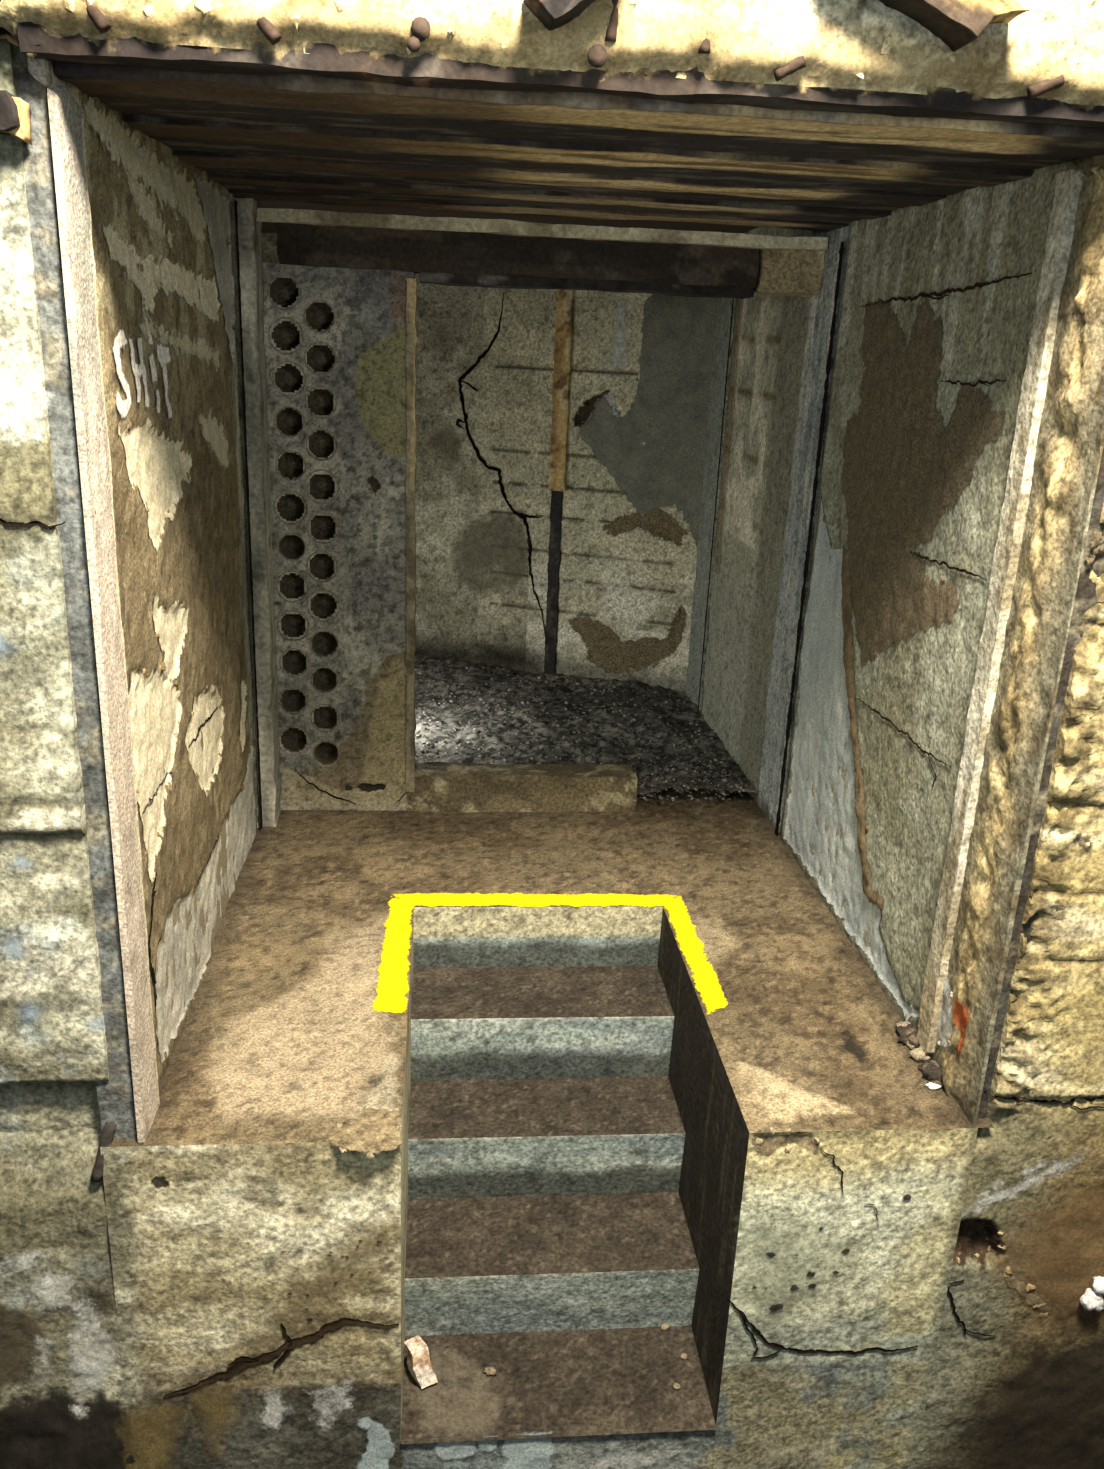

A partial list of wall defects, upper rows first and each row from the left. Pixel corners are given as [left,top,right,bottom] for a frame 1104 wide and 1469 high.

peeling [69,87,236,371]
peeling [118,418,192,551]
crack [456,294,545,634]
spalling [568,604,687,674]
peeling [128,592,260,1063]
rust [952,1000,969,1052]
crack [983,1090,1104,1110]
leakage [0,1250,172,1469]
crack [164,1318,399,1397]
crack [726,1298,918,1359]
spalling [953,1219,1054,1319]
leakage [946,1327,1104,1469]